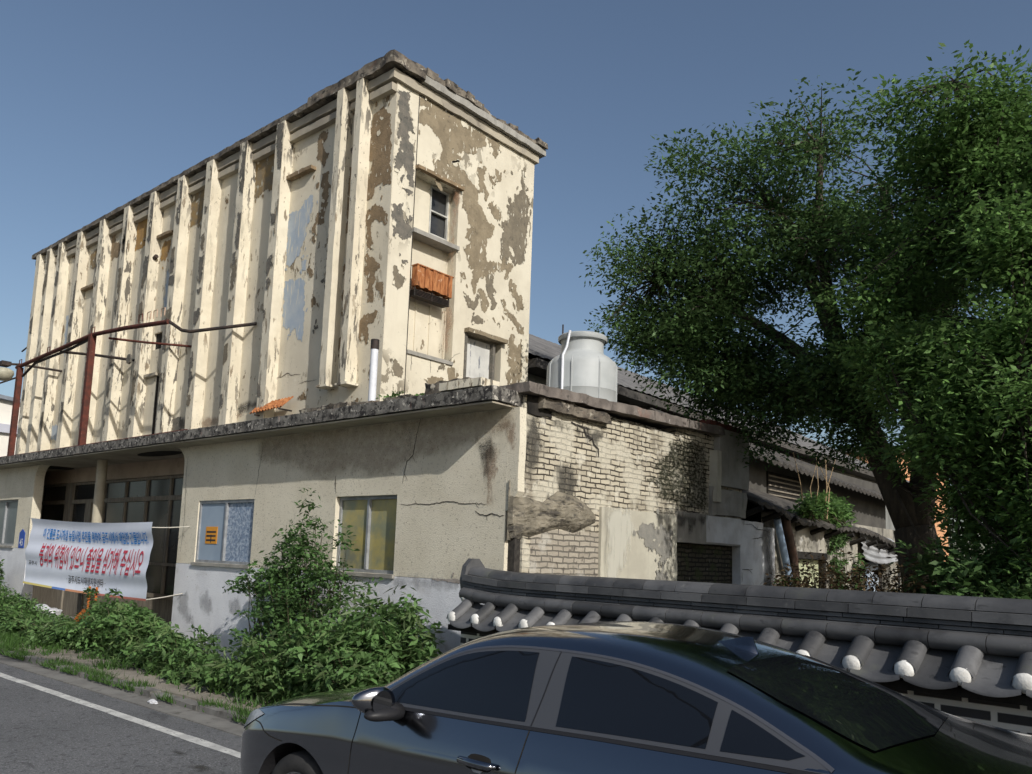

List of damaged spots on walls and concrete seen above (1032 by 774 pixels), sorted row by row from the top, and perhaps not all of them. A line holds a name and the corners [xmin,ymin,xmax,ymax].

peeling [29,201,175,362]
peeling [176,165,212,294]
peeling [225,122,331,342]
peeling [359,89,532,385]
peeling [128,370,136,425]
peeling [172,417,181,431]
crack [401,419,504,521]
leakage [480,441,494,472]
peeling [633,508,673,580]